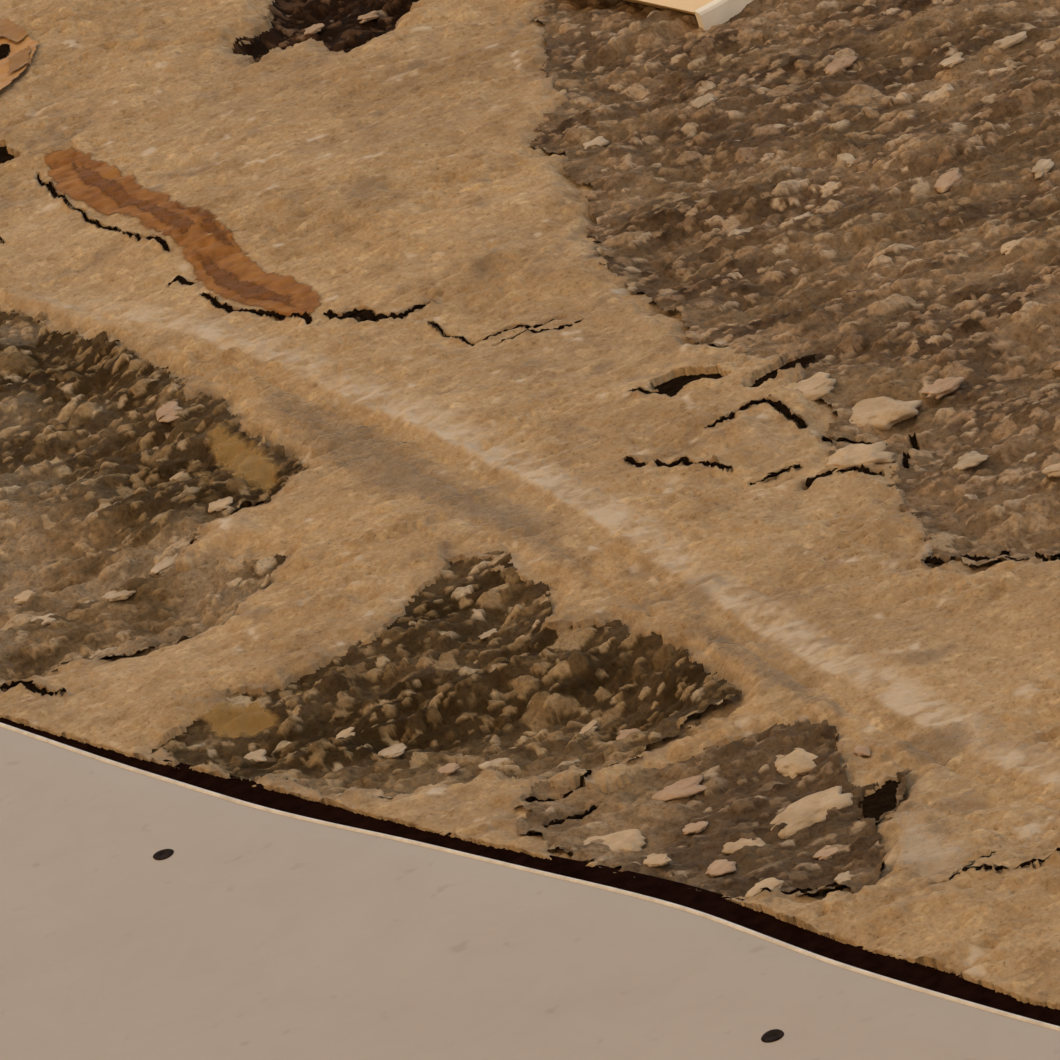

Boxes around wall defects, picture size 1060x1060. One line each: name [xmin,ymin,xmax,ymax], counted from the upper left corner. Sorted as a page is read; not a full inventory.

spalling [232,0,419,63]
crack [37,175,169,251]
corrosion [44,148,320,324]
crack [168,275,584,346]
spalling [528,0,1060,568]
crack [630,386,662,394]
crack [624,394,918,488]
spalling [0,309,310,685]
crack [921,550,1060,565]
spalling [150,550,912,898]
crack [947,847,1060,882]